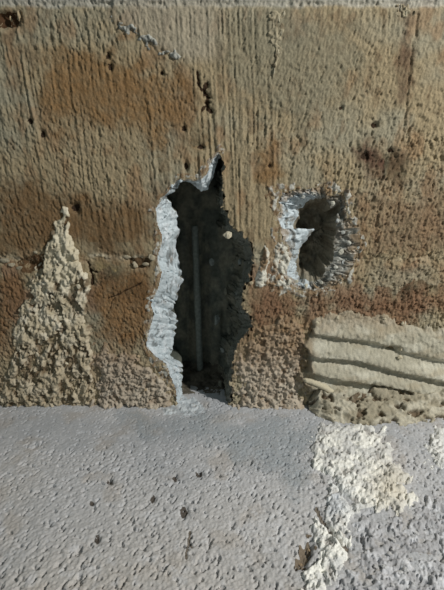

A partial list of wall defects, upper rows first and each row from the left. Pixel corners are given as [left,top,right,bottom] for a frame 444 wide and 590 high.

spalling [88,144,367,410]